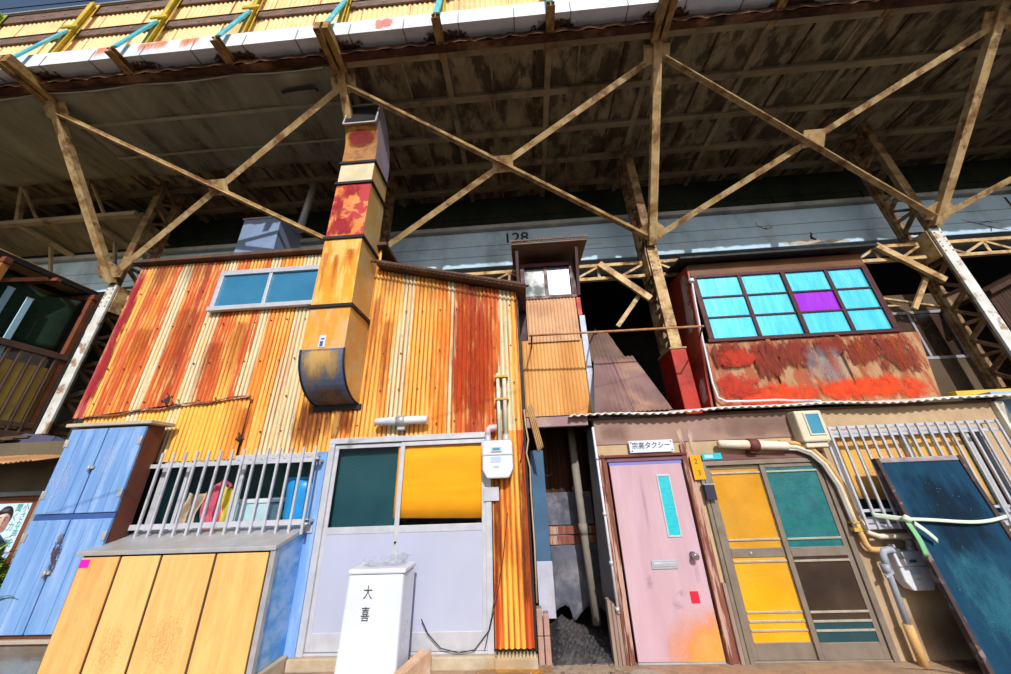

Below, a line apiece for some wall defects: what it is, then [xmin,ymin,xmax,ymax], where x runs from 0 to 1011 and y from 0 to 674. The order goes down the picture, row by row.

corrosion [348,125,374,146]
corrosion [328,184,359,234]
corrosion [82,276,145,402]
corrosion [292,350,353,445]
corrosion [453,299,492,411]
corrosion [519,469,529,600]